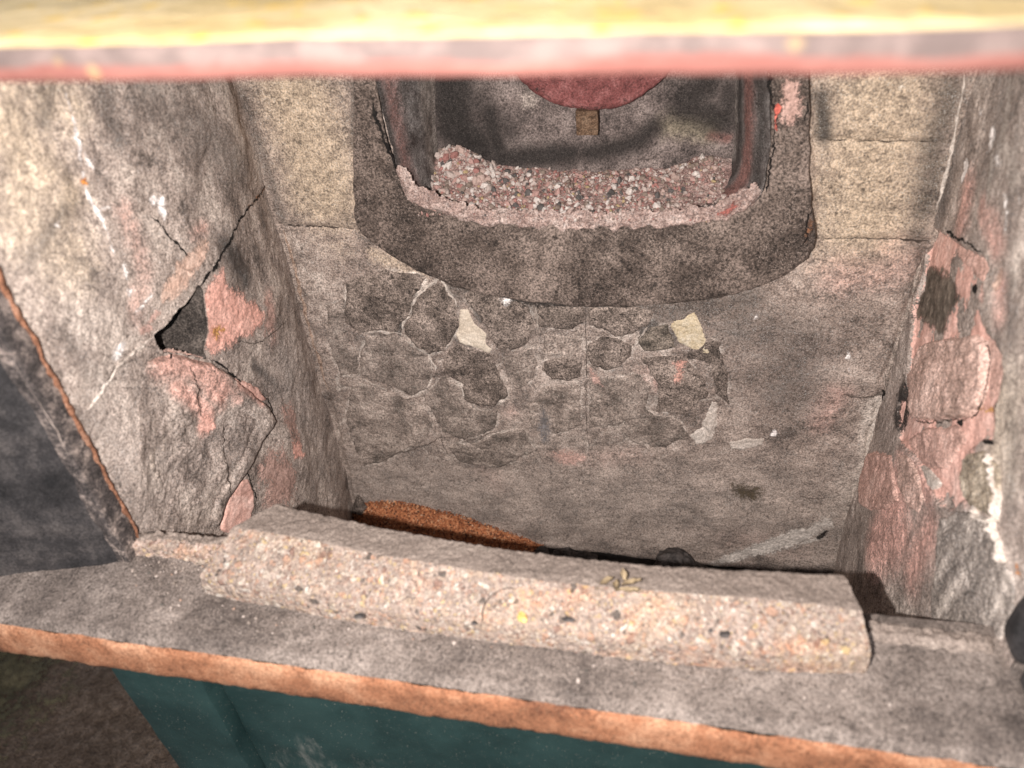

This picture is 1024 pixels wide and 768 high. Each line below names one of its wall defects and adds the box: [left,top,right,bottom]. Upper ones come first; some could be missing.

crack [153,186,265,287]
spalling [154,267,275,359]
spalling [234,378,266,401]
efflorescence [969,454,1007,563]